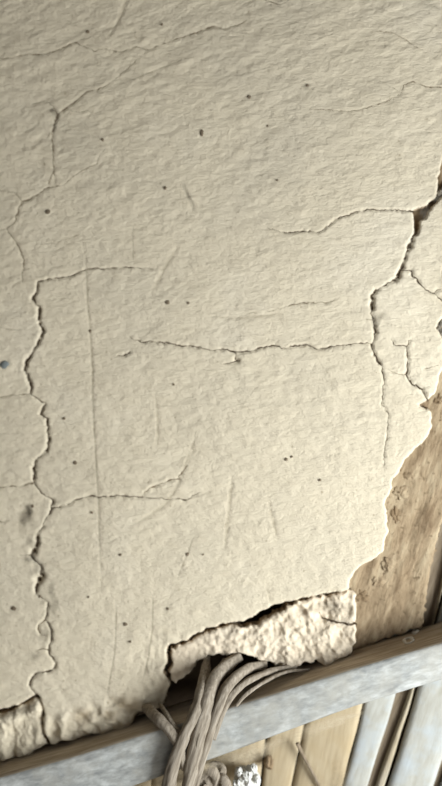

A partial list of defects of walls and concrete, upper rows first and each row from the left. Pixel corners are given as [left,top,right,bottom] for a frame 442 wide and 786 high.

crack [271,209,414,233]
spalling [413,163,442,232]
crack [0,20,247,696]
crack [115,232,442,467]
spalling [168,371,442,683]
crack [319,612,357,626]